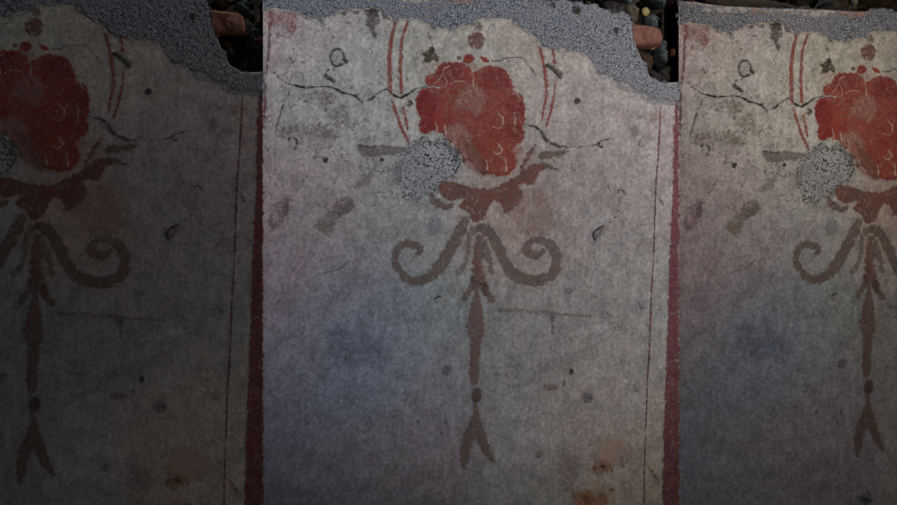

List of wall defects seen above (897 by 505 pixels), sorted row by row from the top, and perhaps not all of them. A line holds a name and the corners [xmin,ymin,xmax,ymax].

flaking render [0,0,266,96]
flaking render [260,0,681,105]
flaking render [676,0,897,51]
crack [273,72,440,132]
crack [529,125,610,148]
crack [688,82,836,133]
flaking render [394,136,464,202]
flaking render [795,143,858,205]